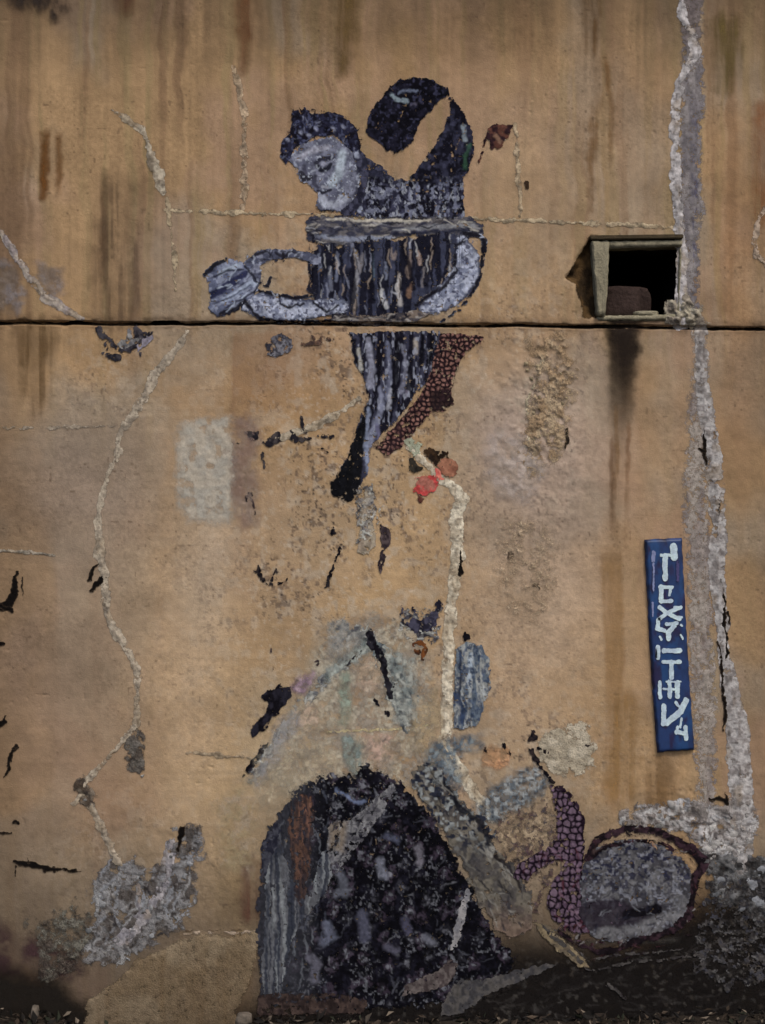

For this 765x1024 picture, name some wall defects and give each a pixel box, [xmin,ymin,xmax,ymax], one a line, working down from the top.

crack [110,65,365,292]
flaking render [491,332,579,495]
crack [462,0,765,875]
water stain [607,312,640,403]
crack [0,229,616,952]
flaking render [538,721,598,777]
spalling [23,823,207,983]